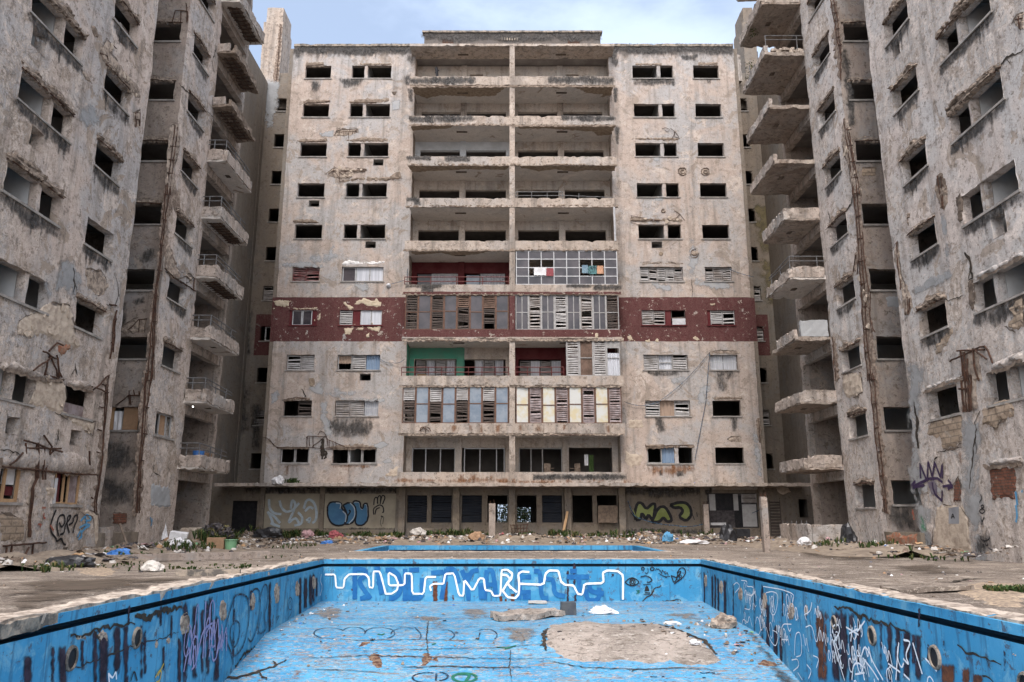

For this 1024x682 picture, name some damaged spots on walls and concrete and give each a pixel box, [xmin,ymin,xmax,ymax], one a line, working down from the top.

peeling [326,163,617,183]
spalling [0,0,260,554]
peeling [338,298,381,310]
peeling [344,323,381,338]
flaking render [927,327,1014,450]
leakage [329,418,372,436]
flaking render [989,466,1016,500]
peeling [545,621,721,666]